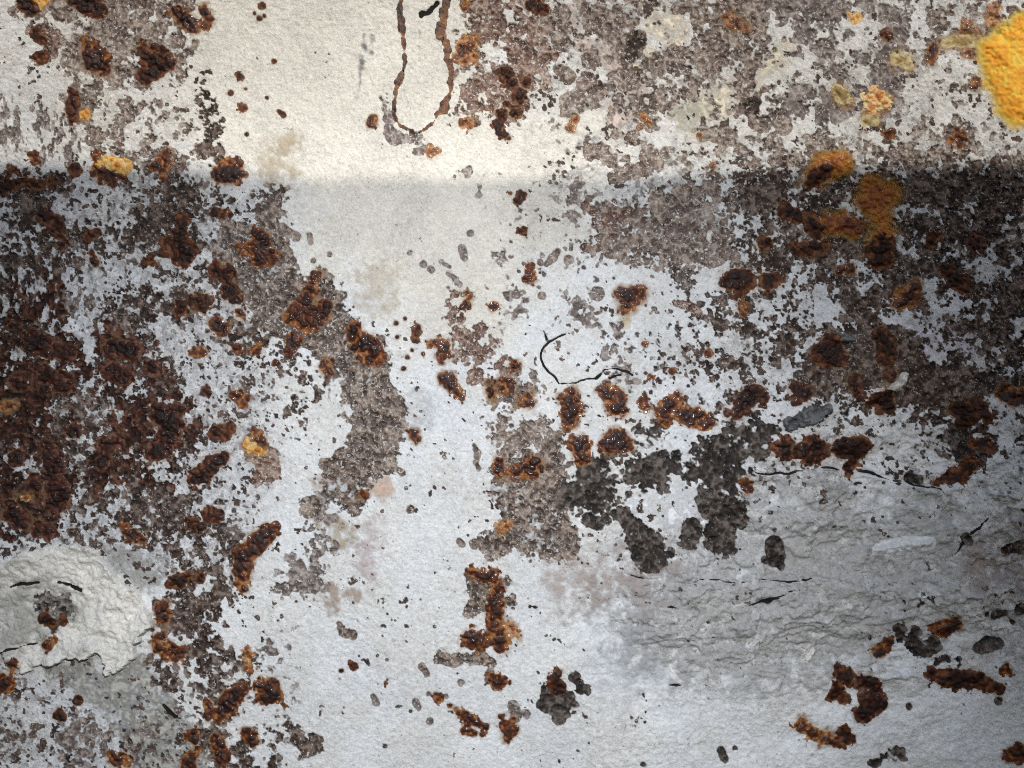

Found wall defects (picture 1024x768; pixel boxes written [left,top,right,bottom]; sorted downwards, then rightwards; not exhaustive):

rust [394,317,466,404]
crack [540,331,633,384]
rust [557,367,770,466]
rust [185,420,269,491]
rust [767,432,874,481]
rust [231,521,282,597]
crack [0,642,36,653]
rust [180,646,289,768]
rust [431,692,519,744]
rust [460,563,521,656]
rust [789,661,888,750]
rust [923,663,1015,695]